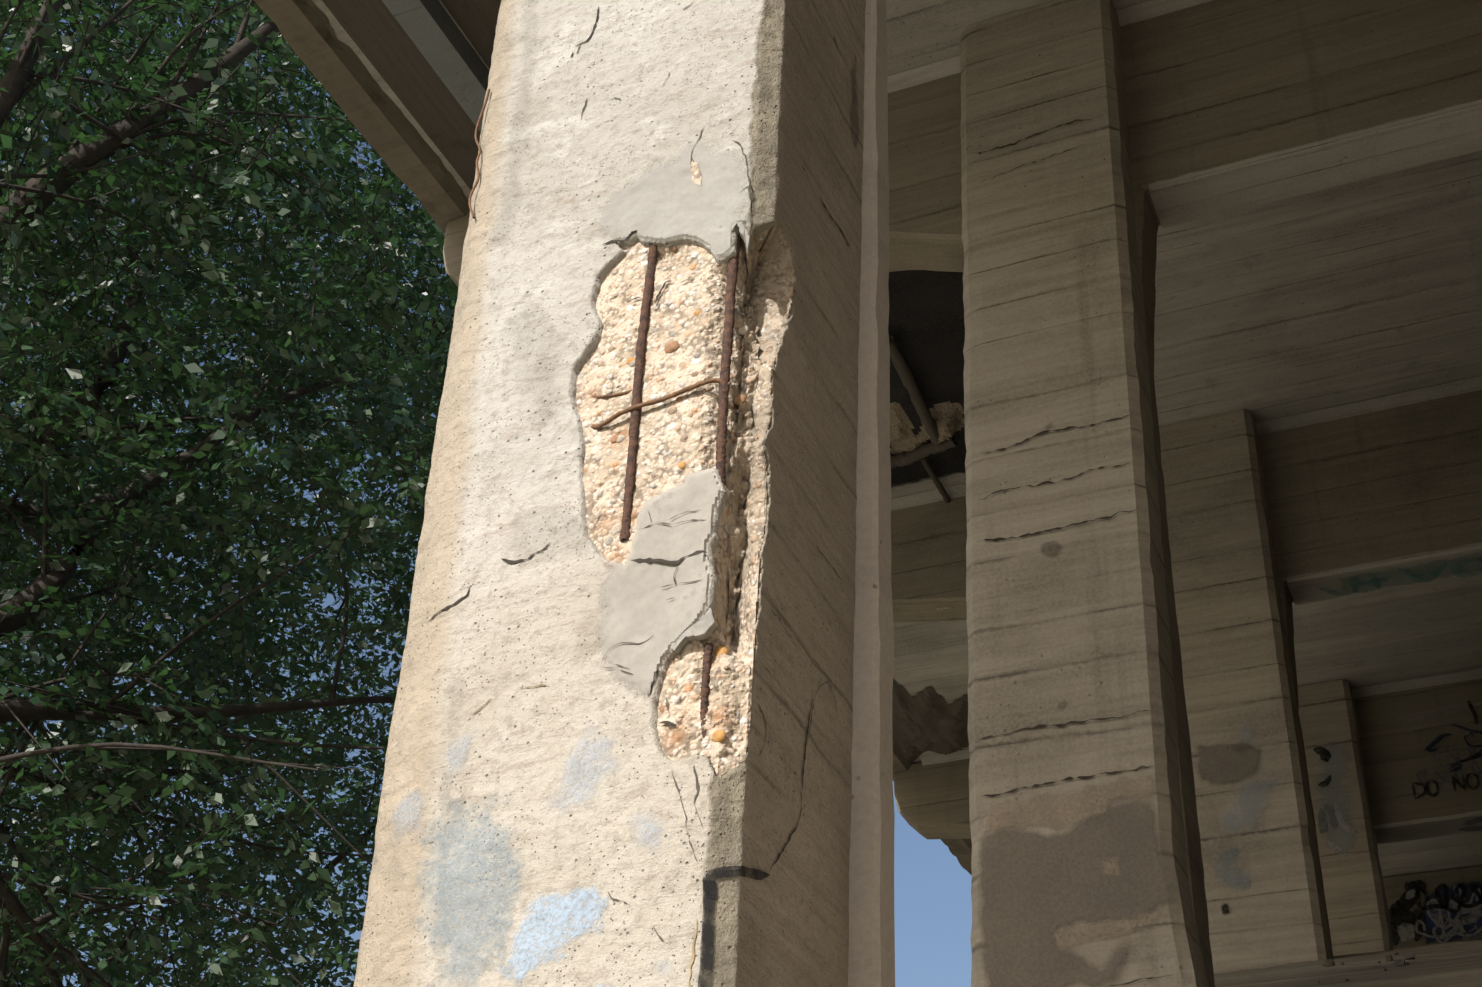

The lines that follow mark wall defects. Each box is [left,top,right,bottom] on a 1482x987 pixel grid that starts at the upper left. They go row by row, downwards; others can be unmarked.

crack [977,119,1090,184]
spalling [575,144,796,777]
spalling [889,336,965,503]
crack [978,462,1133,501]
crack [982,414,1132,454]
crack [977,508,1138,542]
spalling [892,679,969,762]
crack [978,710,1150,741]
crack [769,682,837,872]
crack [981,765,1154,797]
leakage [980,803,1170,987]